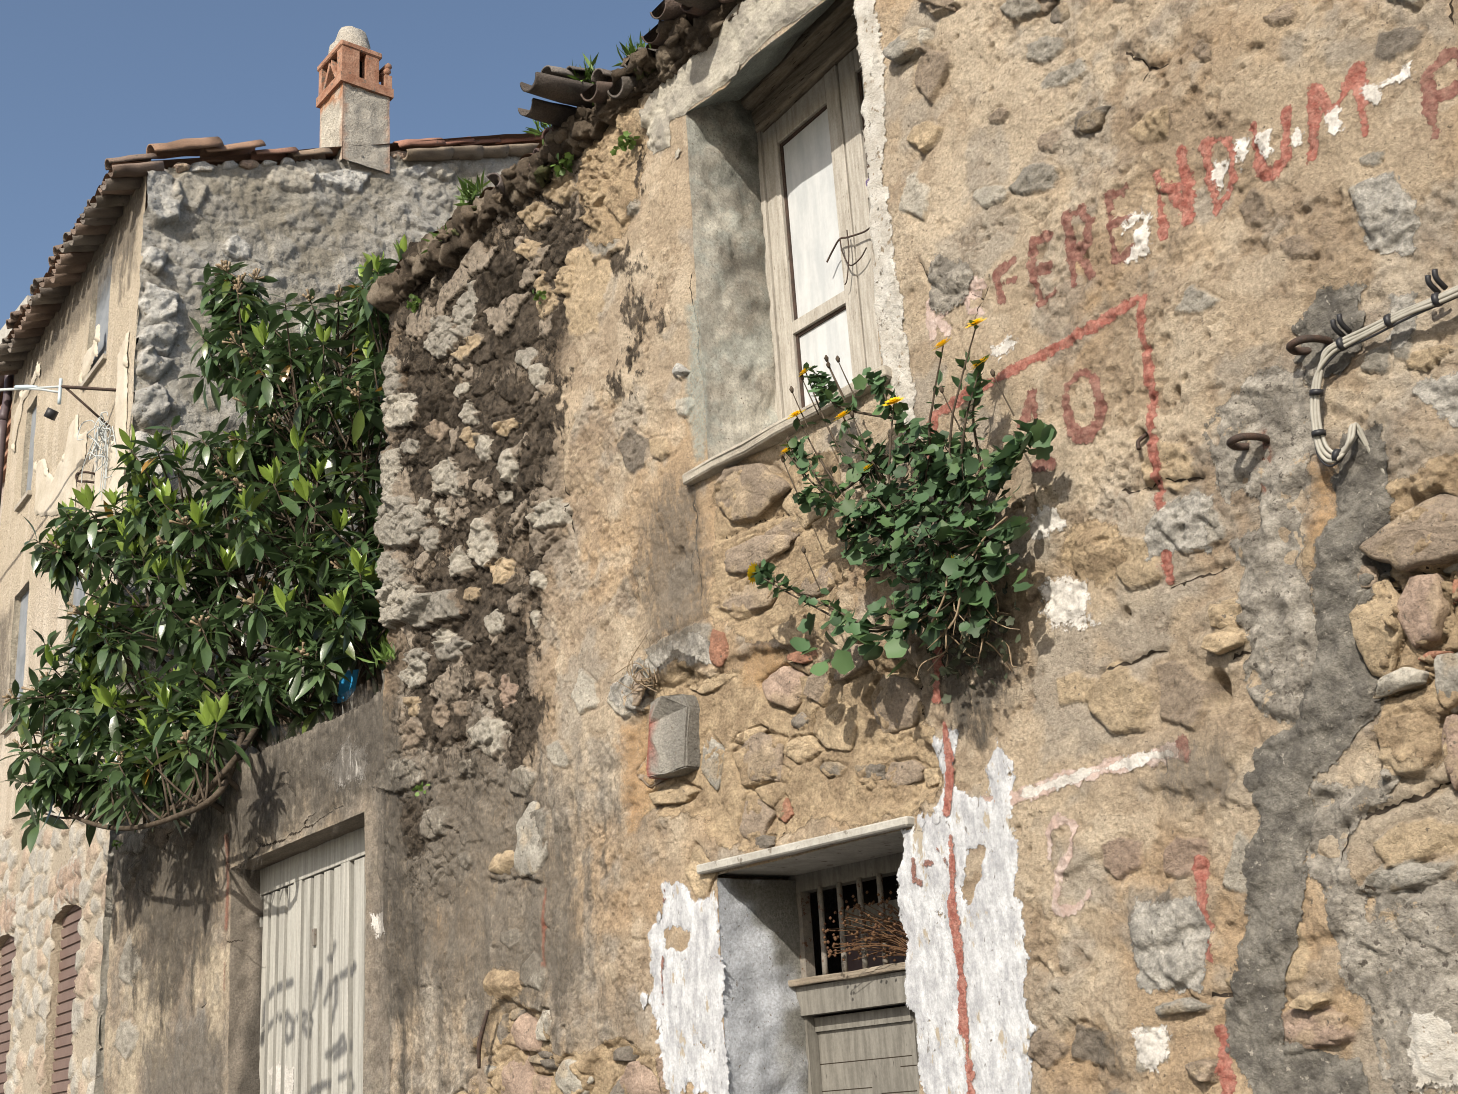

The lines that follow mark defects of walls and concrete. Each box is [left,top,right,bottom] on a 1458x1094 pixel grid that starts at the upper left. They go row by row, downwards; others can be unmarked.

crack [1447,0,1455,24]
spalling [1300,516,1334,567]
leakage [939,630,1014,748]
crack [1107,650,1168,669]
crack [1233,651,1252,660]
spalling [1349,451,1458,797]
spalling [457,450,1037,1094]
leakage [115,689,578,1094]